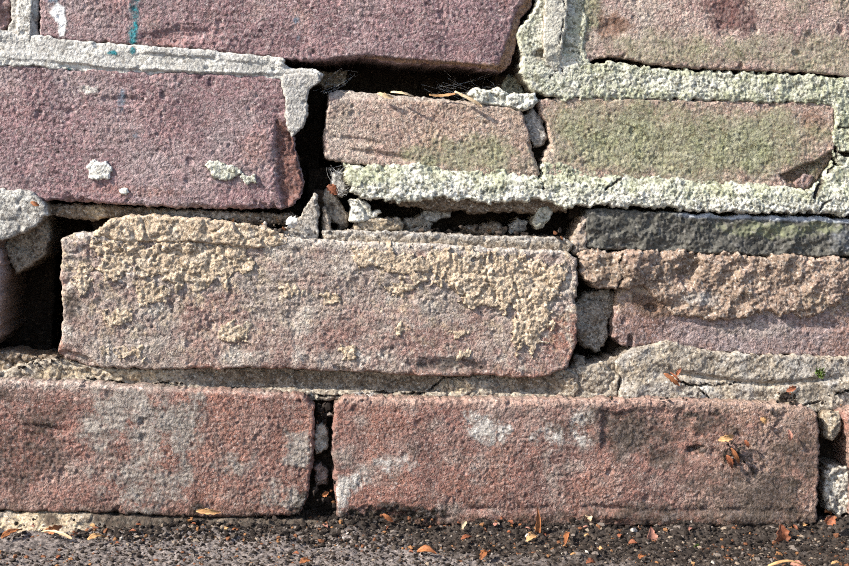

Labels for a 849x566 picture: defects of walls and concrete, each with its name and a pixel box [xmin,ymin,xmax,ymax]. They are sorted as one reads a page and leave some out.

peeling [62,0,531,328]
crack [751,127,849,219]
crack [562,178,731,220]
peeling [431,210,571,237]
peeling [0,252,61,350]
peeling [347,240,568,358]
spalling [632,293,670,318]
peeling [218,318,254,348]
peeling [99,344,146,363]
peeling [338,344,357,361]
peeling [455,347,472,362]
crack [678,381,741,398]